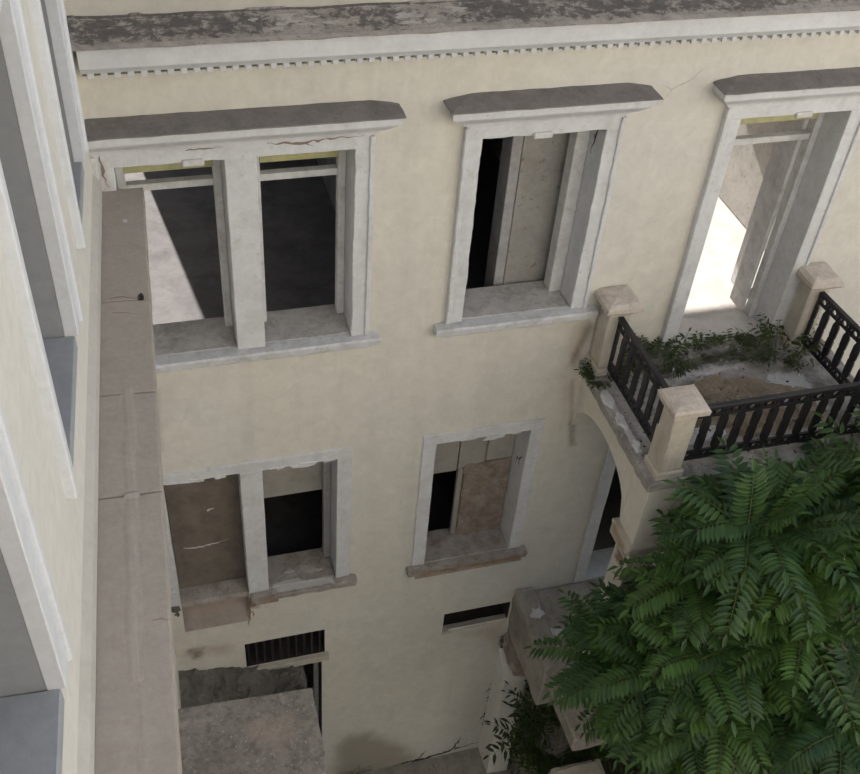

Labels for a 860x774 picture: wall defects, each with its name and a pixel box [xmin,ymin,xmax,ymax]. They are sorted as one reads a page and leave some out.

peeling [269,13,342,31]
peeling [395,12,437,24]
peeling [267,135,364,146]
spalling [270,459,335,470]
crack [395,684,491,766]